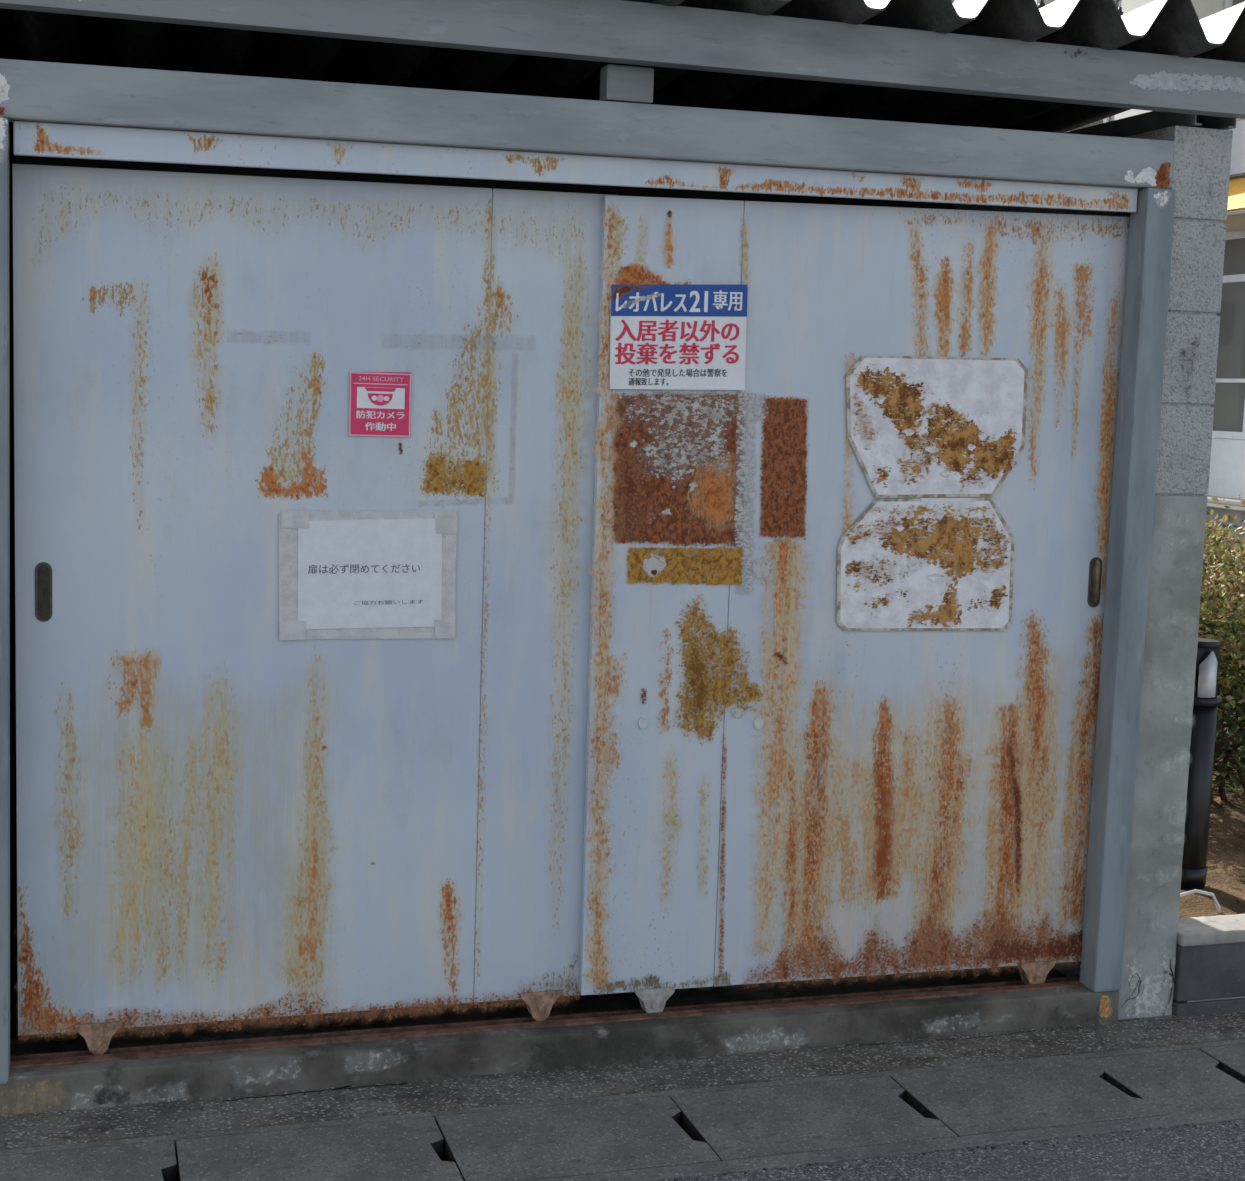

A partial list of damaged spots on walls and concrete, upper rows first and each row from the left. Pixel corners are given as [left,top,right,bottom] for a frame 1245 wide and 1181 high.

peeling [0,73,10,152]
rust [35,124,100,155]
rust [184,133,223,152]
rust [503,154,562,176]
rust [17,166,1130,1041]